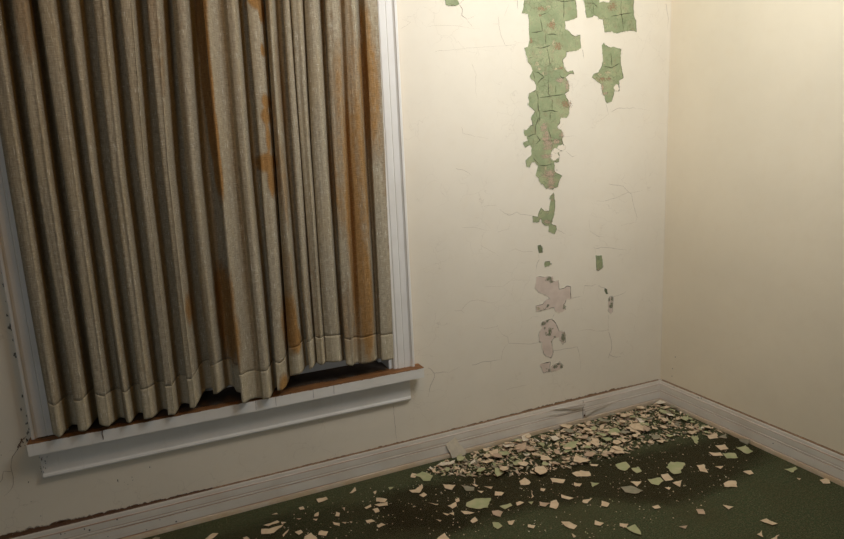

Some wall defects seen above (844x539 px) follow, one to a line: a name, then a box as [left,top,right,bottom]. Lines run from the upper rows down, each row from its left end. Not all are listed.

peeling [521,0,637,235]
peeling [534,244,572,374]